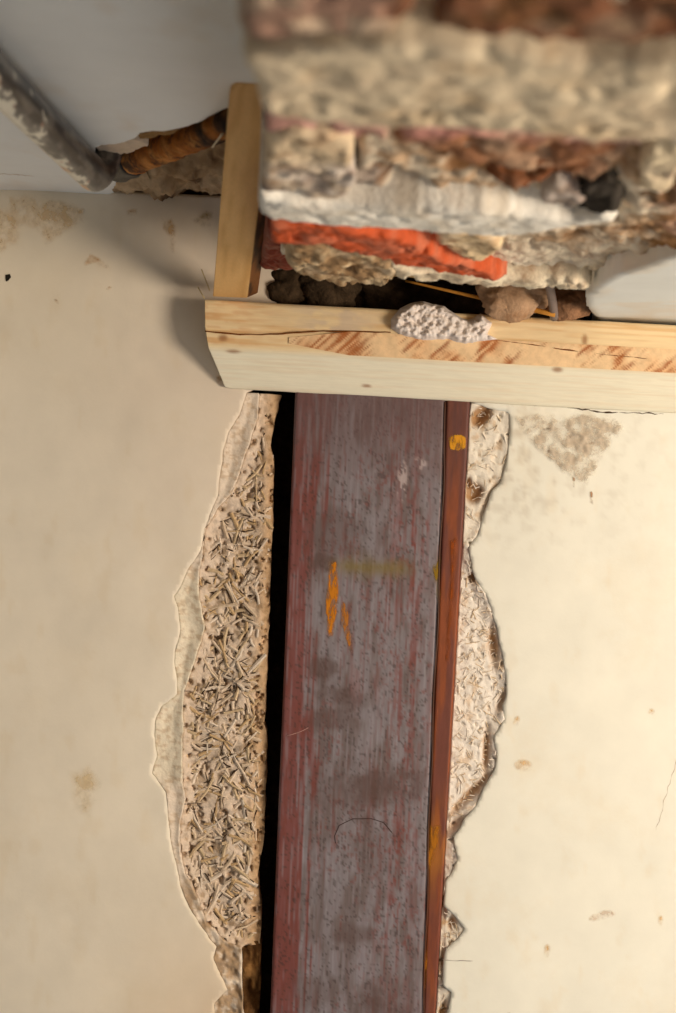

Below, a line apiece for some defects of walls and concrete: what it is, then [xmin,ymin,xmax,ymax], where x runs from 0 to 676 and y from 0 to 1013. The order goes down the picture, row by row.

flaking render [237,0,676,290]
corrosion [450,435,466,450]
corrosion [326,562,351,646]
spalling [152,391,295,1013]
corrosion [429,826,439,867]